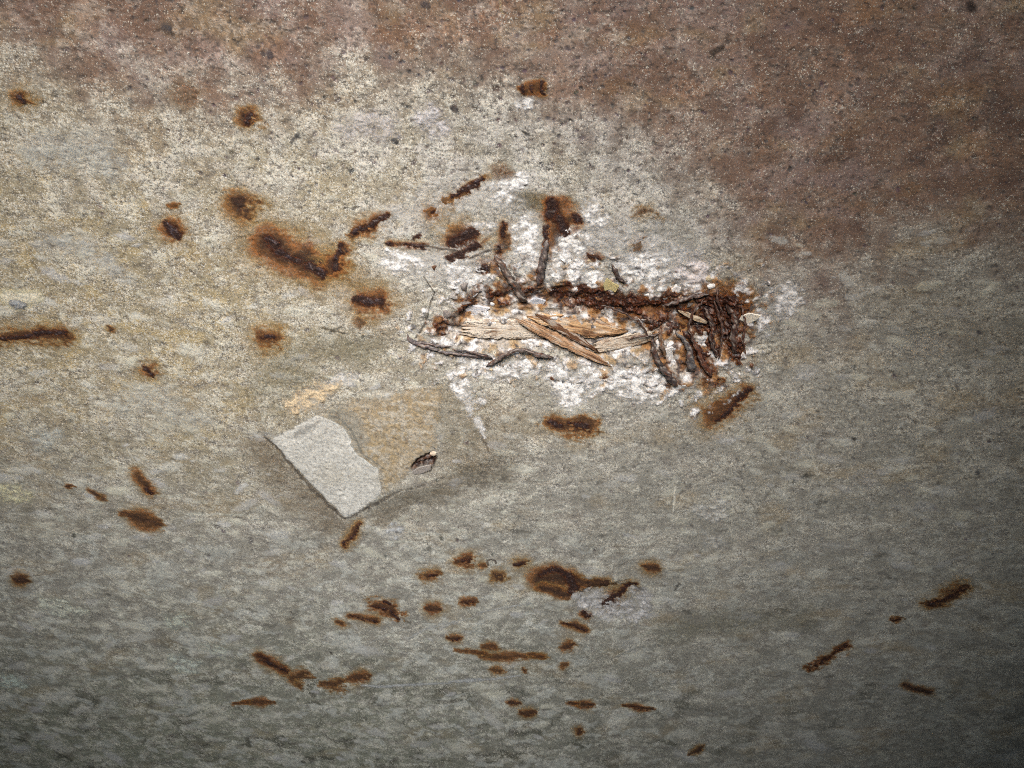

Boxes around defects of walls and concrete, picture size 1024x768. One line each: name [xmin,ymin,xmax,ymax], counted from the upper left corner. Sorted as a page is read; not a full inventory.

corrosion [220,167,528,329]
water stain [380,171,709,293]
corrosion [536,195,584,286]
corrosion [0,324,76,347]
spalling [392,246,780,419]
water stain [757,281,805,332]
water stain [446,354,686,439]
corrosion [536,414,604,442]
corrosion [675,331,761,430]
corrosion [118,467,166,532]
corrosion [453,552,662,607]
corrosion [445,610,593,675]